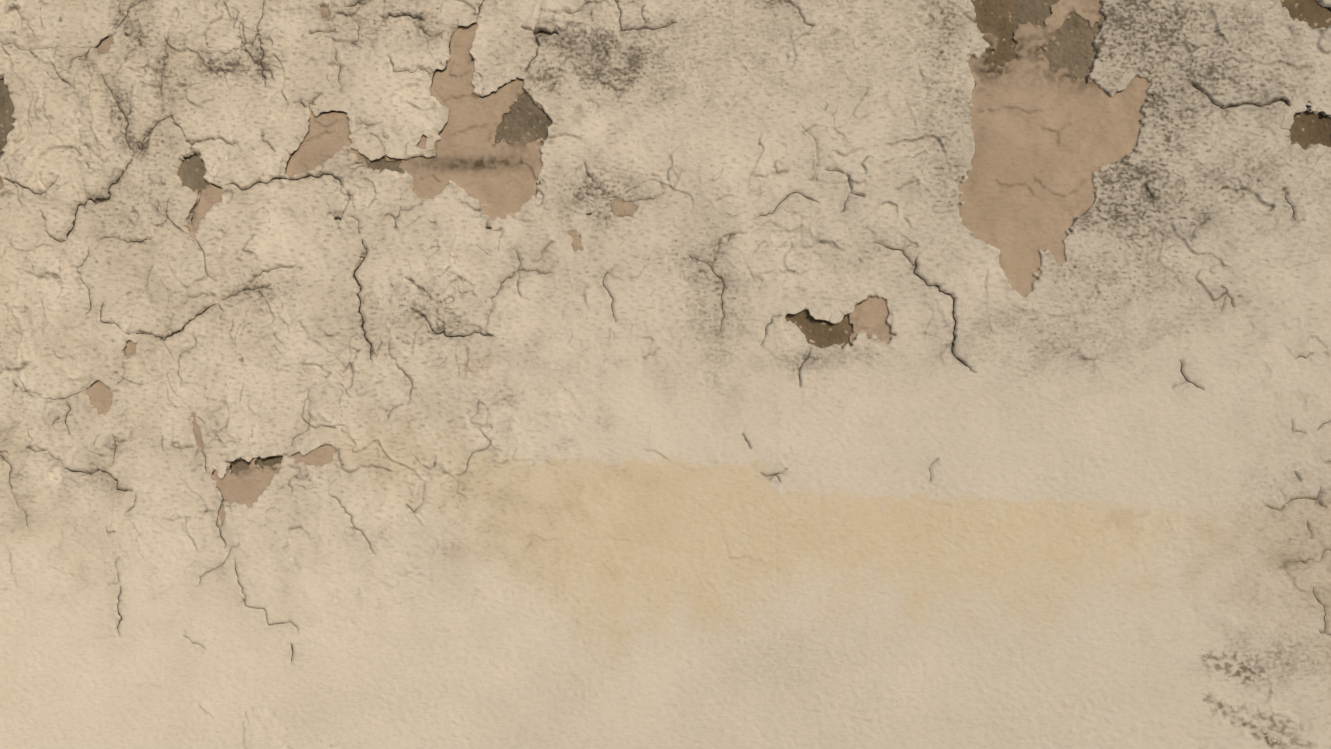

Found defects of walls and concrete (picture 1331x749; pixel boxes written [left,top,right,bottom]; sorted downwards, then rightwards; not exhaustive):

peeling [0,75,16,159]
peeling [177,153,223,239]
crack [1,0,412,419]
peeling [285,15,552,220]
crack [524,0,676,69]
peeling [957,0,1152,298]
crack [1190,79,1292,109]
spalling [1281,103,1331,149]
peeling [779,296,896,349]
crack [873,242,974,372]
crack [0,376,136,637]
damp [291,395,1331,749]